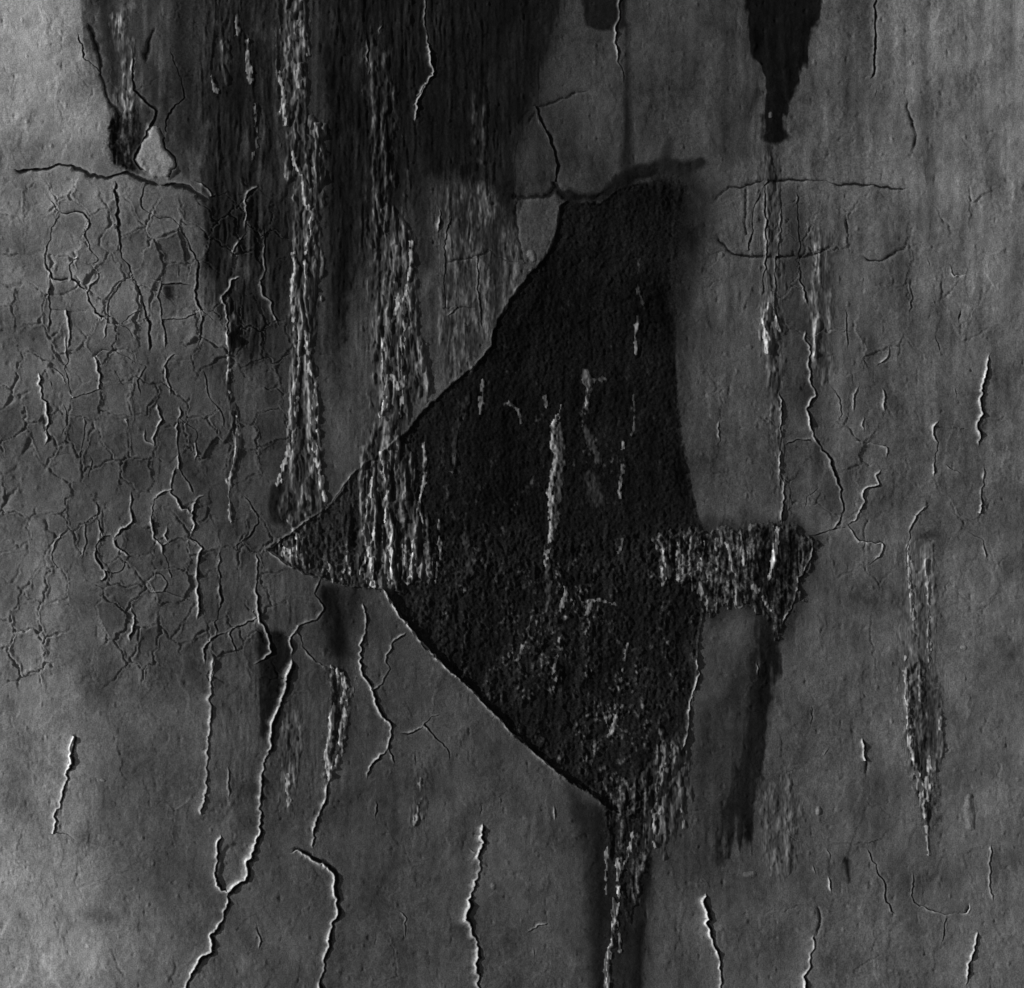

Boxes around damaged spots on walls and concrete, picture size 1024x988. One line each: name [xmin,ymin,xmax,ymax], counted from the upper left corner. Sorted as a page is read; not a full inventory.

crack [14,23,357,988]
spalling [264,468,360,588]
water stain [69,0,872,988]
spalling [388,171,821,988]
crack [712,178,974,627]
crack [929,352,991,559]
spalling [320,665,358,788]
crack [356,589,586,821]
spalling [901,675,948,834]
crack [454,796,502,988]
crack [525,920,550,958]
crack [695,892,724,988]